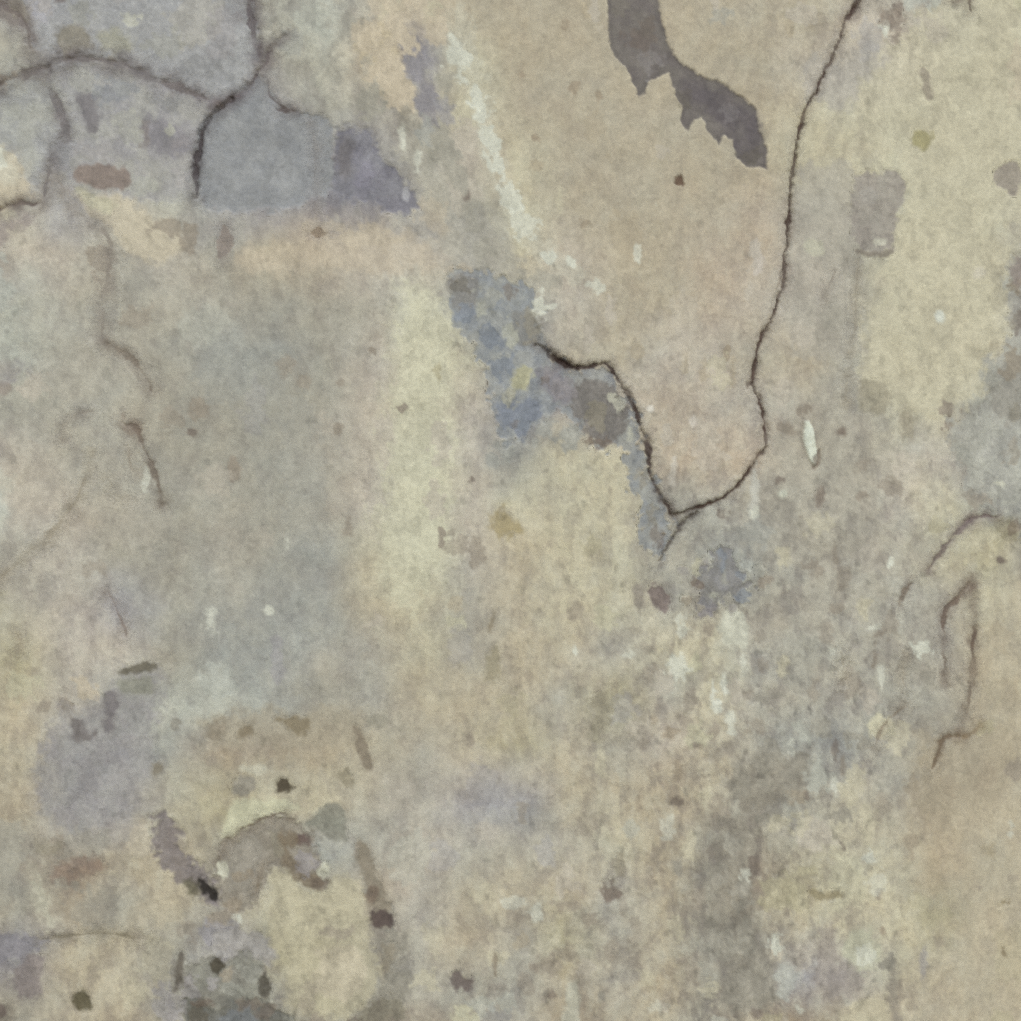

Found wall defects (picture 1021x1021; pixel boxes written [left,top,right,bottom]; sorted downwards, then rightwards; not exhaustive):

crack [0,0,307,592]
crack [526,0,869,575]
crack [831,640,854,695]
crack [863,503,1009,780]